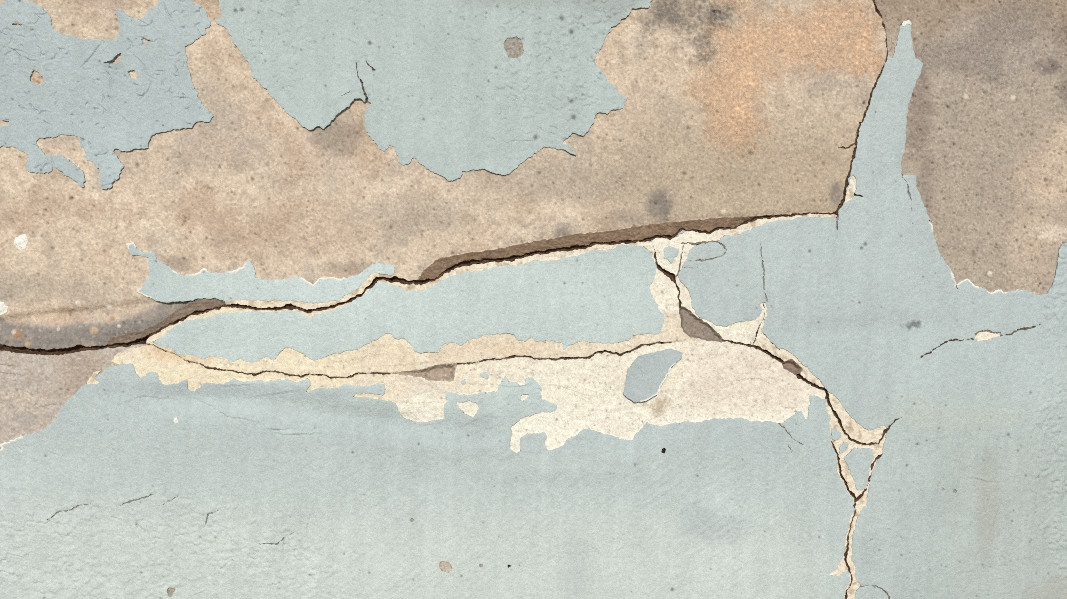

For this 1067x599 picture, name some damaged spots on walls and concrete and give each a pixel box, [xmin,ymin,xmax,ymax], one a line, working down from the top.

flaking render [0,229,886,599]
crack [0,0,902,445]
peeling [0,0,1067,350]
crack [831,441,890,599]
crack [920,324,1040,358]